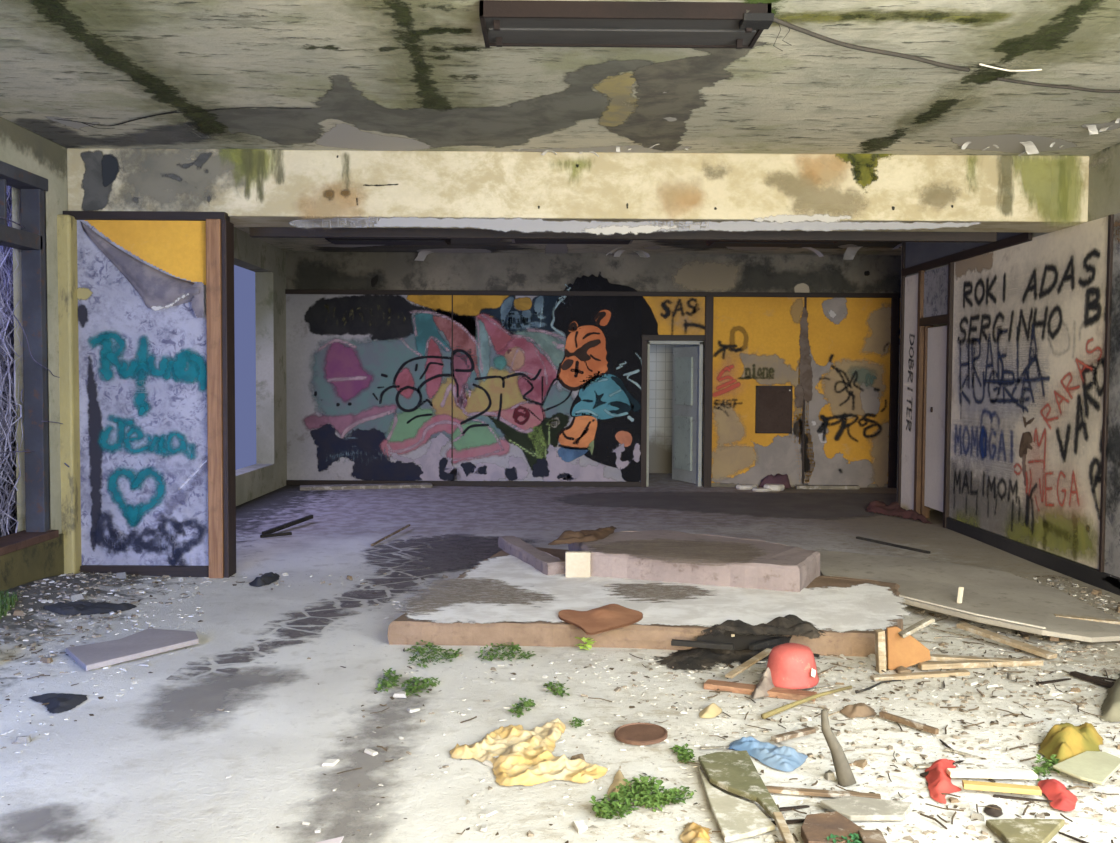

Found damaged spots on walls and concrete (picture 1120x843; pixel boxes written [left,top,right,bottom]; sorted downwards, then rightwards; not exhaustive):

water stain [841,12,980,23]
water stain [961,0,1106,85]
water stain [0,0,767,211]
water stain [769,174,864,216]
water stain [924,188,954,206]
water stain [999,155,1081,222]
spalling [674,260,739,292]
spalling [794,283,810,293]
peeling [822,298,848,324]
peeling [711,305,891,488]
water stain [417,536,499,572]
water stain [149,668,296,728]